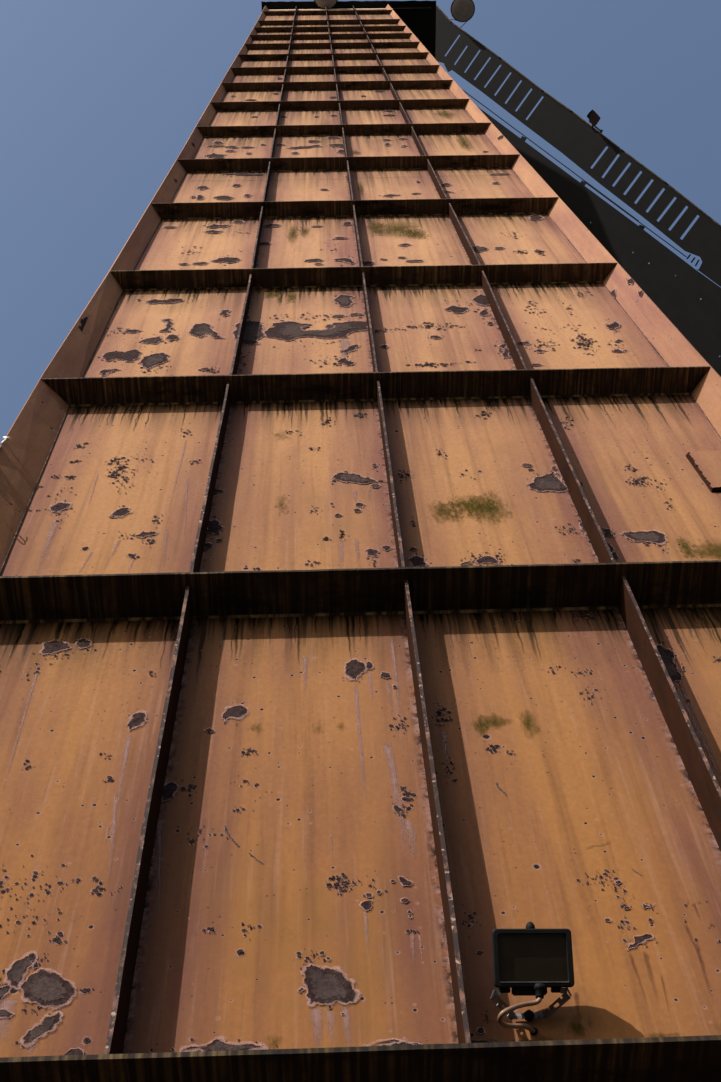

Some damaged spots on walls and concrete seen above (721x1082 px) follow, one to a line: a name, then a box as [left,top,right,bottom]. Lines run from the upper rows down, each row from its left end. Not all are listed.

peeling [78,290,494,376]
peeling [522,463,584,492]
peeling [601,528,669,561]
peeling [14,636,96,751]
peeling [204,704,248,733]
peeling [342,643,408,769]
peeling [0,855,122,1050]
peeling [297,948,360,1035]
peeling [576,869,657,957]